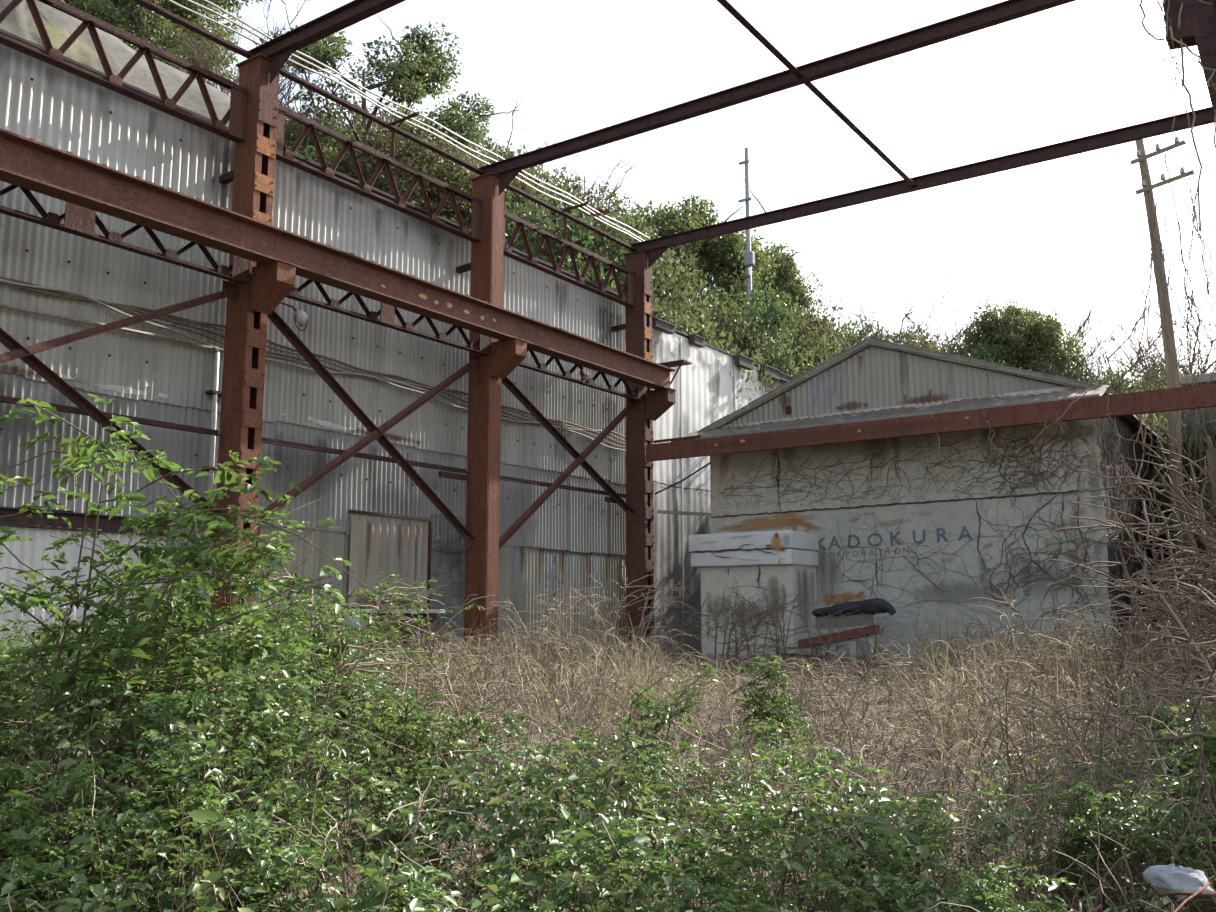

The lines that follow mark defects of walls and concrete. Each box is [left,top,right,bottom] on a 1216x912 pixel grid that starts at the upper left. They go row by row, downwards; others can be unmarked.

rust [904,390,940,404]
rust [724,513,817,532]